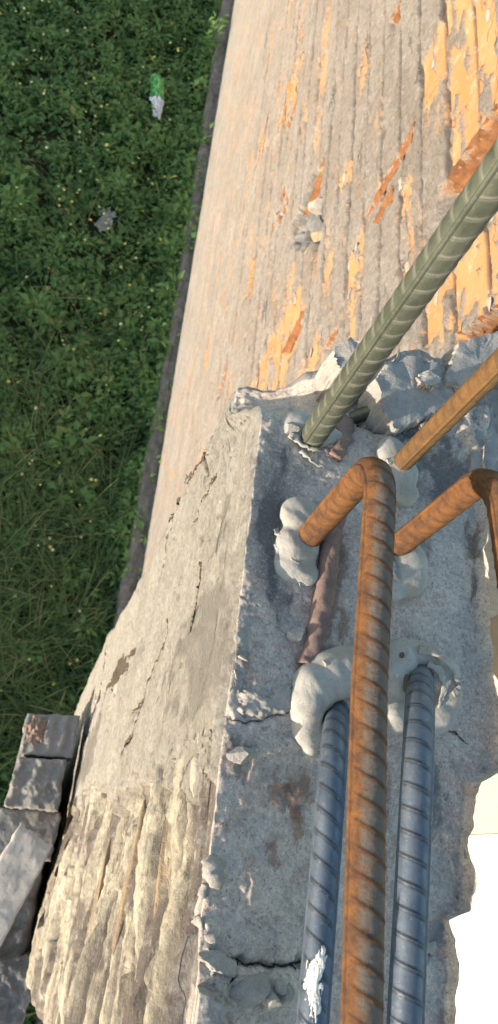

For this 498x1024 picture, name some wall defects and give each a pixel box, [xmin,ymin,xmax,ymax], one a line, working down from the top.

peeling [278,48,305,127]
peeling [362,0,498,273]
spalling [272,157,325,253]
peeling [338,236,362,302]
peeling [416,212,498,346]
peeling [254,289,338,391]
spalling [415,370,442,391]
spalling [396,420,427,442]
crack [158,449,217,582]
peeling [228,592,251,706]
crack [230,958,301,983]